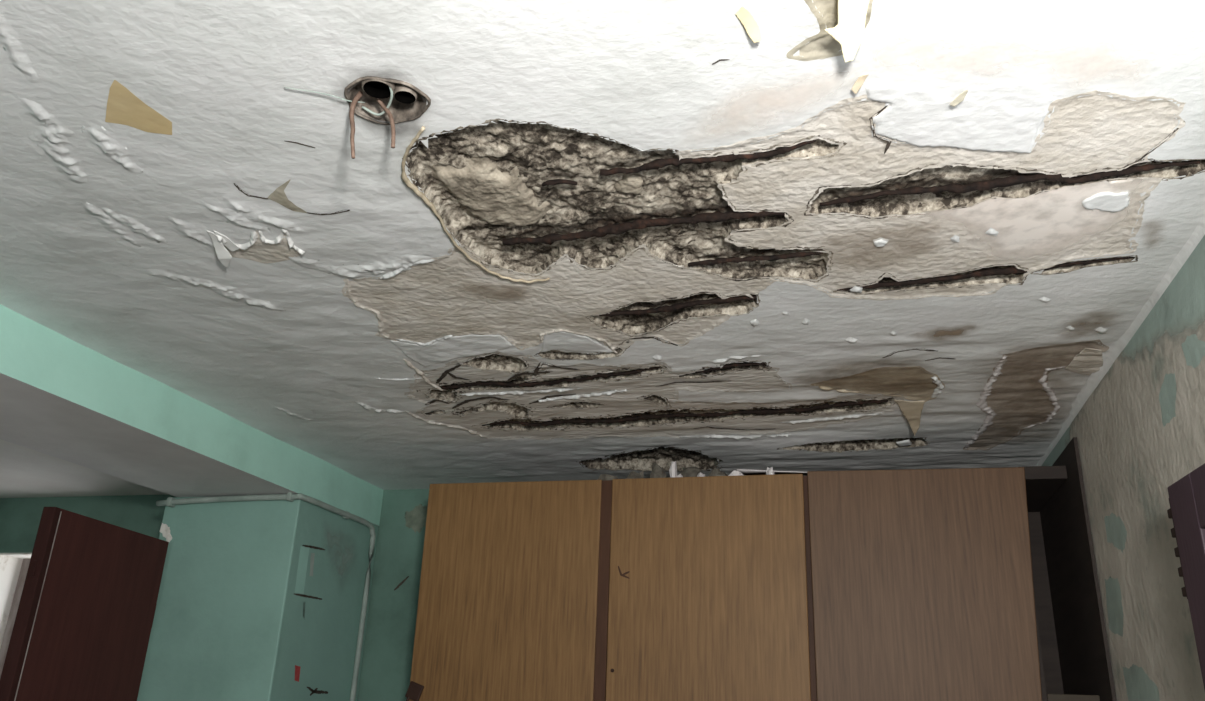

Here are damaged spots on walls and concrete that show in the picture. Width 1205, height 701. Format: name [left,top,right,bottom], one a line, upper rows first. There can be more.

peeling [786,0,873,62]
peeling [105,80,172,135]
peeling [267,180,307,213]
peeling [207,229,305,268]
peeling [342,74,1205,472]